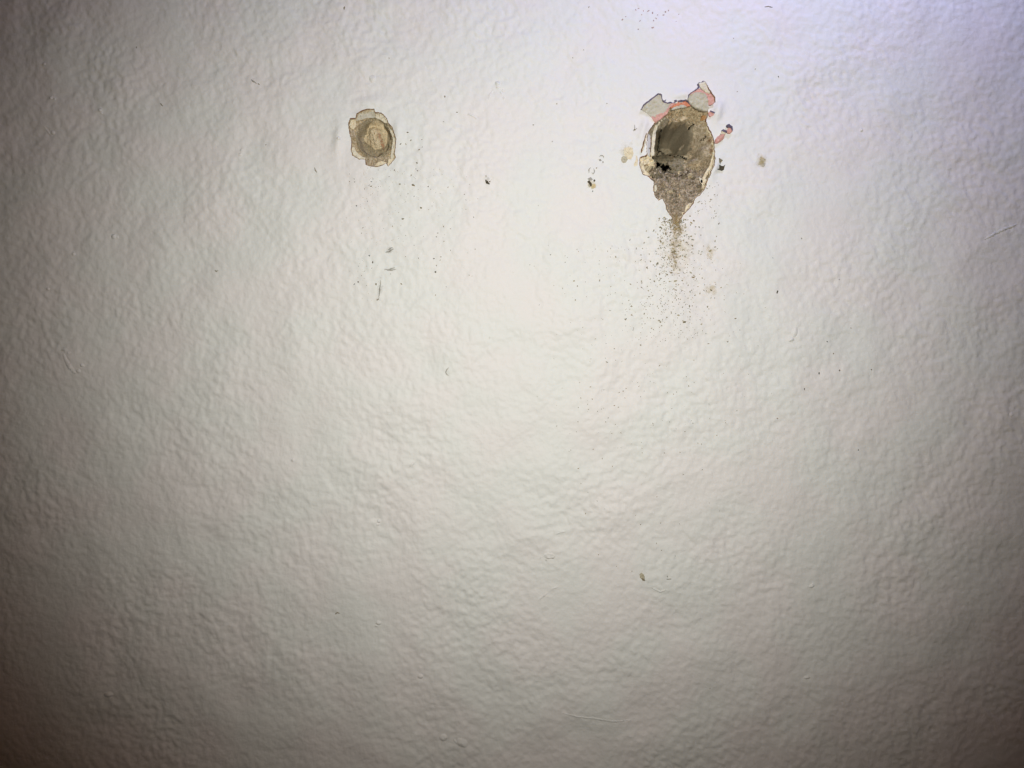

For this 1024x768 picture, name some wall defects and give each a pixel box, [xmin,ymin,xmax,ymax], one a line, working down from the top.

spalling [348,109,396,167]
spalling [621,81,733,223]